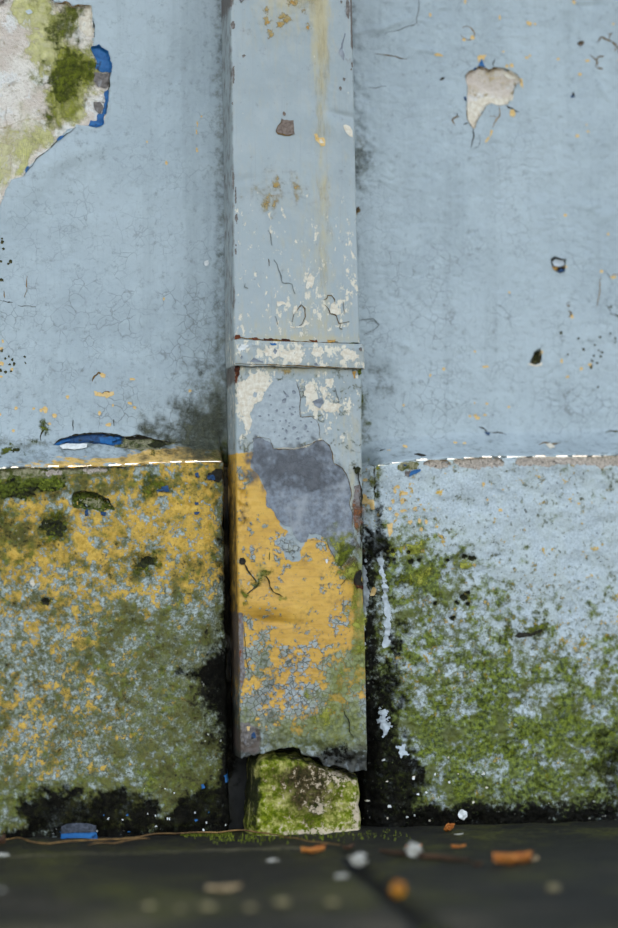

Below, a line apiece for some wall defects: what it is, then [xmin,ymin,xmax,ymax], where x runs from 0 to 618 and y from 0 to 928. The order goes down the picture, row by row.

corrosion [263,6,291,39]
peeling [0,0,112,204]
peeling [451,51,523,148]
peeling [0,340,26,378]
spalling [0,465,159,479]
peeling [235,343,363,566]
leakage [217,518,229,546]
leakage [5,561,235,839]
leakage [356,505,571,827]
leakage [596,732,618,801]